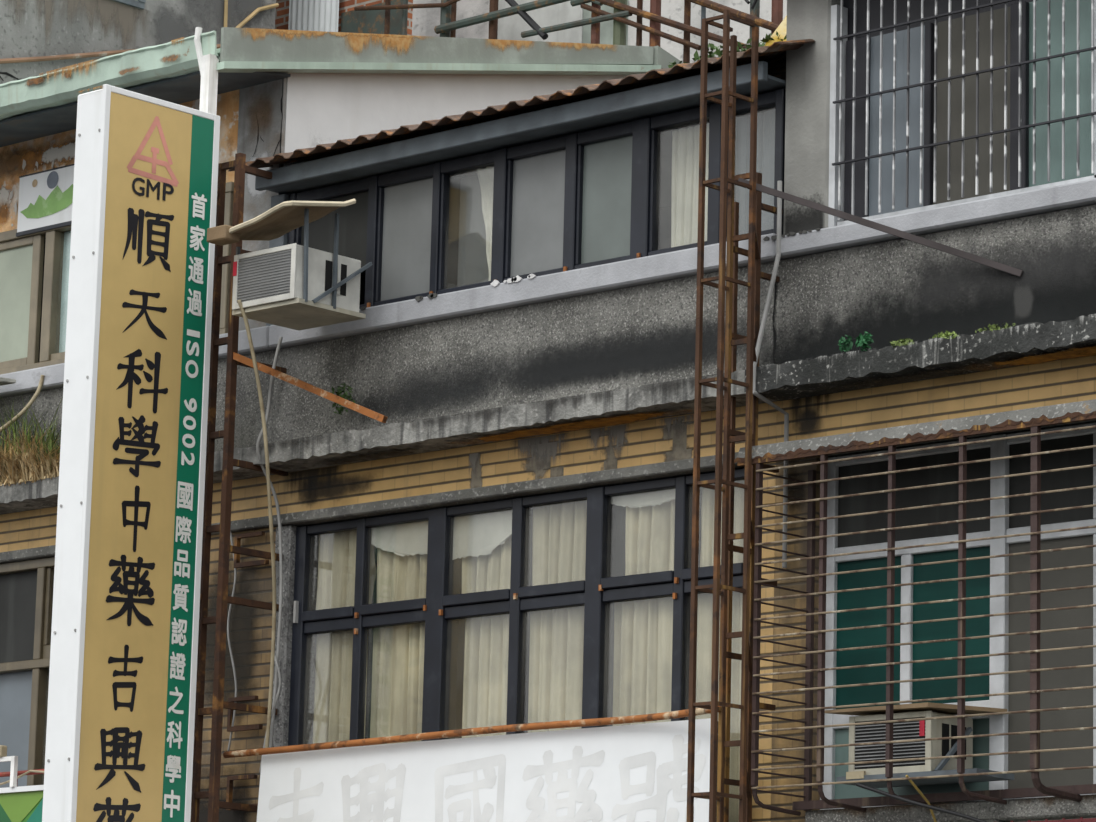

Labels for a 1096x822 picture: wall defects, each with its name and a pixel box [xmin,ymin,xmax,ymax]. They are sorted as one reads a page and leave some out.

rust [161,37,184,62]
rust [246,28,422,53]
rust [488,39,532,50]
rust [551,42,613,50]
rust [26,59,94,86]
peeling [0,141,76,226]
leakage [785,198,823,235]
leakage [765,246,1096,366]
leakage [363,325,725,425]
leakage [479,412,663,442]
leakage [792,394,828,434]
leakage [288,450,417,503]